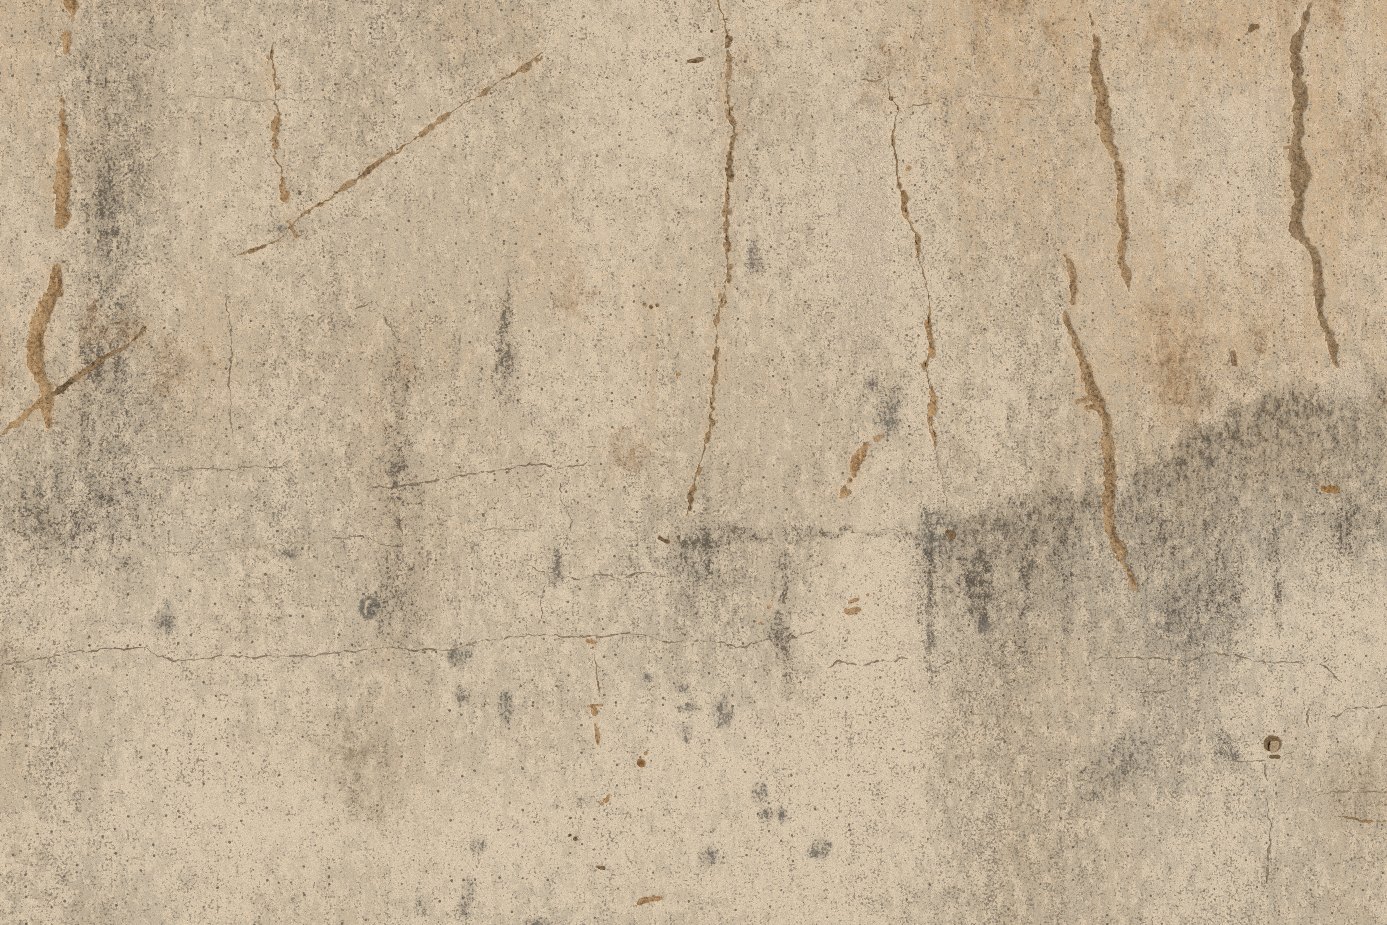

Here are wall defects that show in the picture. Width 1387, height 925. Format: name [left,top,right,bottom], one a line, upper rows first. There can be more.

crack [53,98,72,229]
crack [62,0,79,55]
crack [0,264,146,436]
crack [188,42,543,256]
crack [1,461,816,697]
crack [686,0,737,516]
crack [839,435,884,499]
crack [863,44,1049,508]
crack [1062,254,1137,591]
crack [1081,0,1131,292]
damp [905,364,1386,715]
crack [1283,2,1339,368]